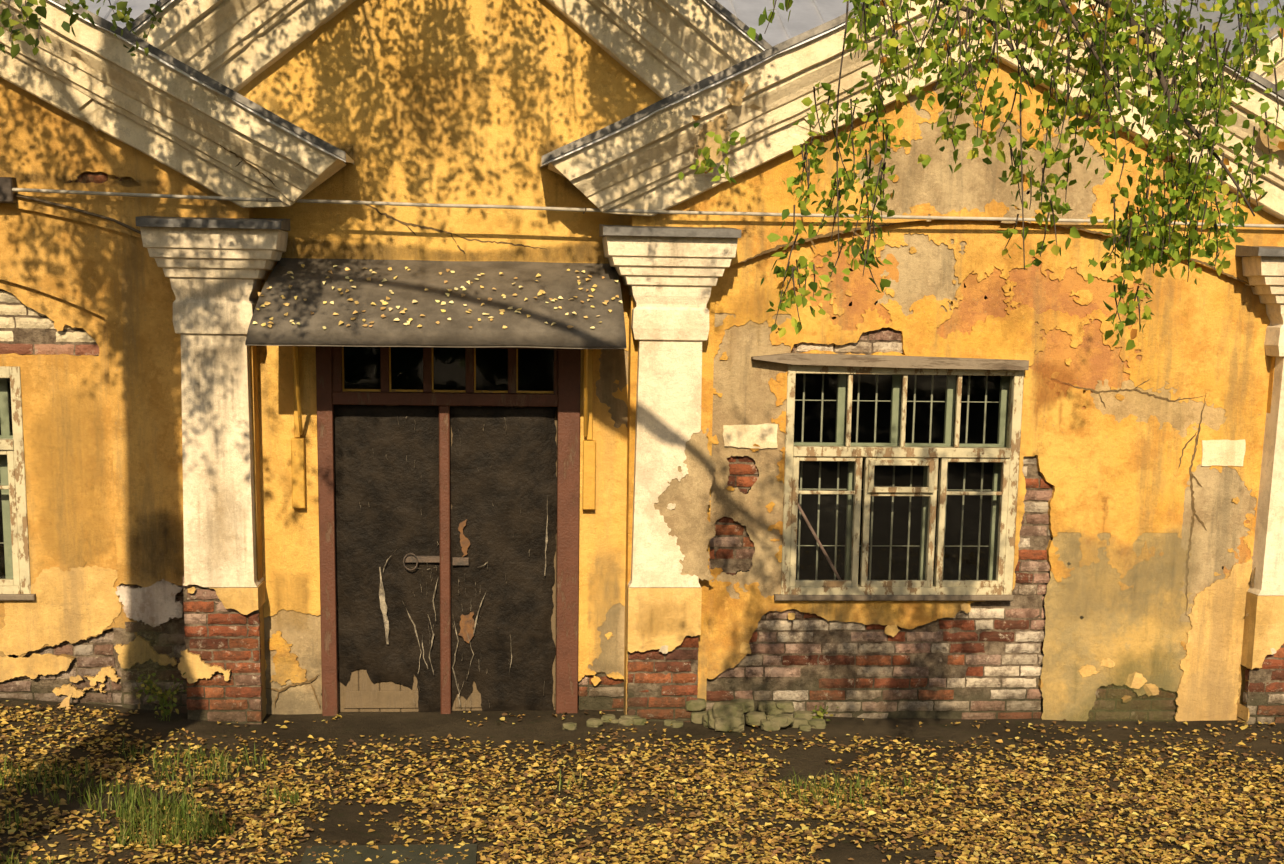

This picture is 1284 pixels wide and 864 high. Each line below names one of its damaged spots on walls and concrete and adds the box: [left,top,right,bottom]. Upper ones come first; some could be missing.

crack [359,200,547,254]
spalling [0,289,99,356]
spalling [578,61,1257,722]
crack [1049,378,1207,616]
spalling [0,576,322,724]
spalling [1243,644,1284,724]